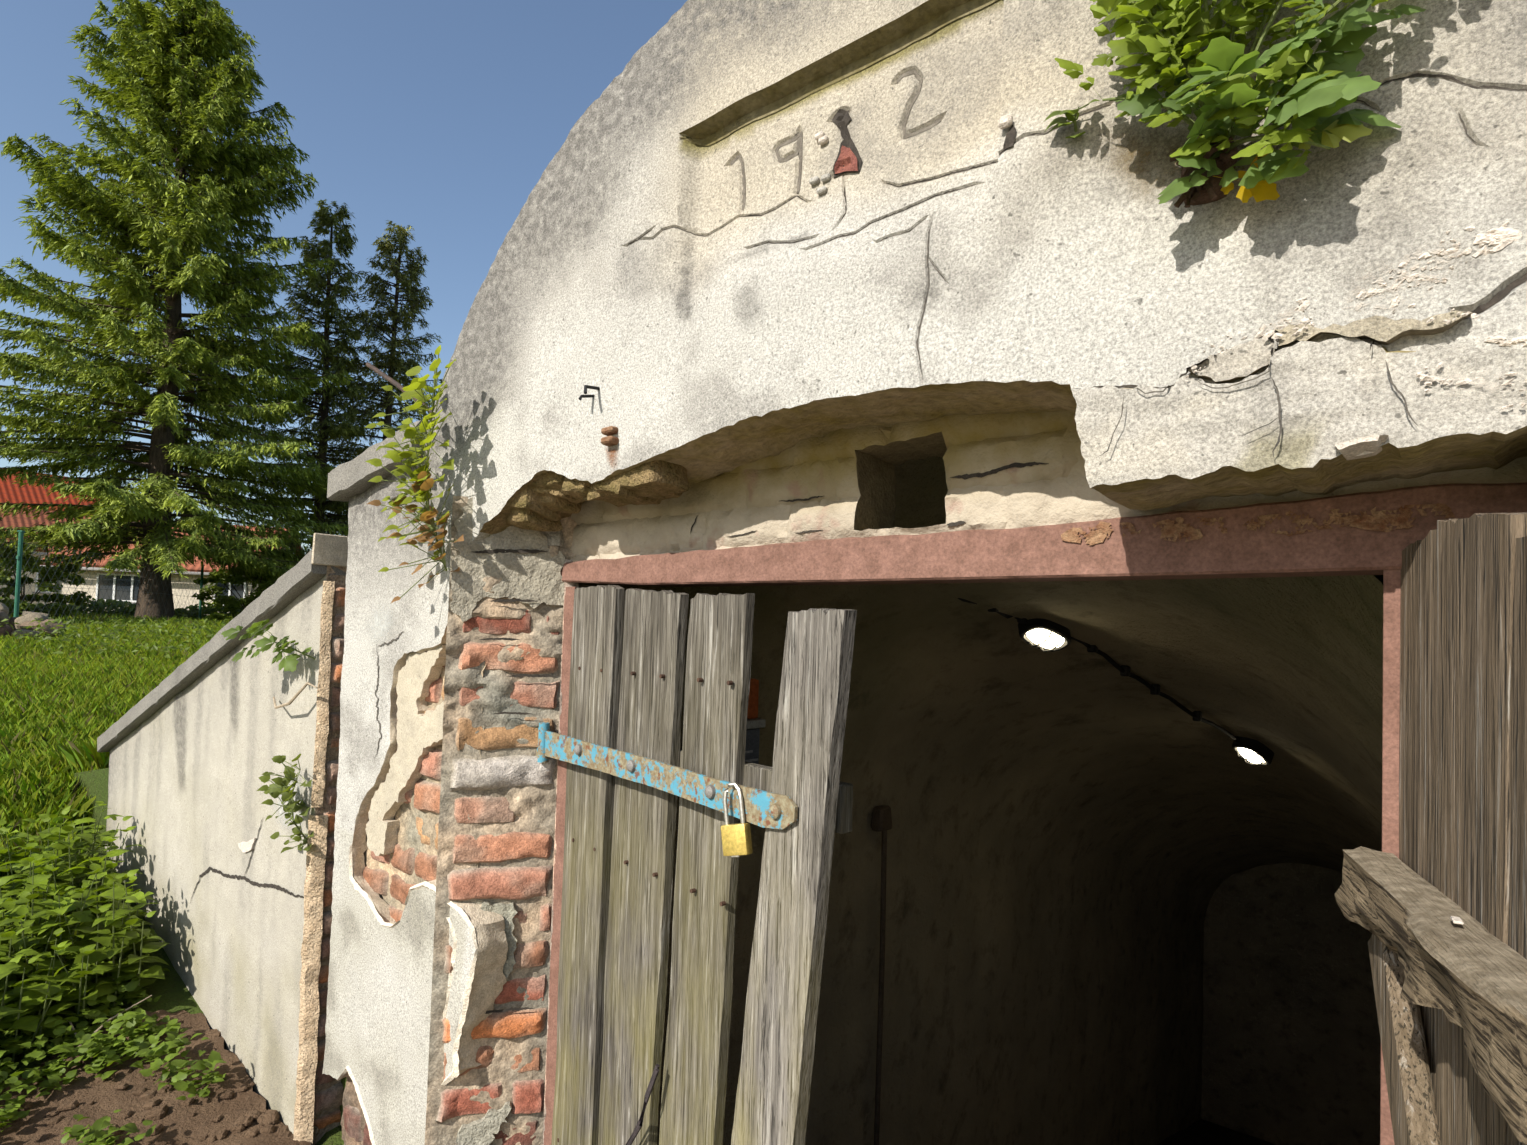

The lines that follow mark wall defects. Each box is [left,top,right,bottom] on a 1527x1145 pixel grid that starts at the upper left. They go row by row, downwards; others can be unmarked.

crack [1356,73,1527,143]
crack [627,105,1109,384]
crack [1472,273,1527,315]
crack [1370,332,1418,426]
peeling [1335,435,1389,460]
flaking render [506,460,689,532]
crack [190,818,304,903]
flaking render [293,581,479,1145]